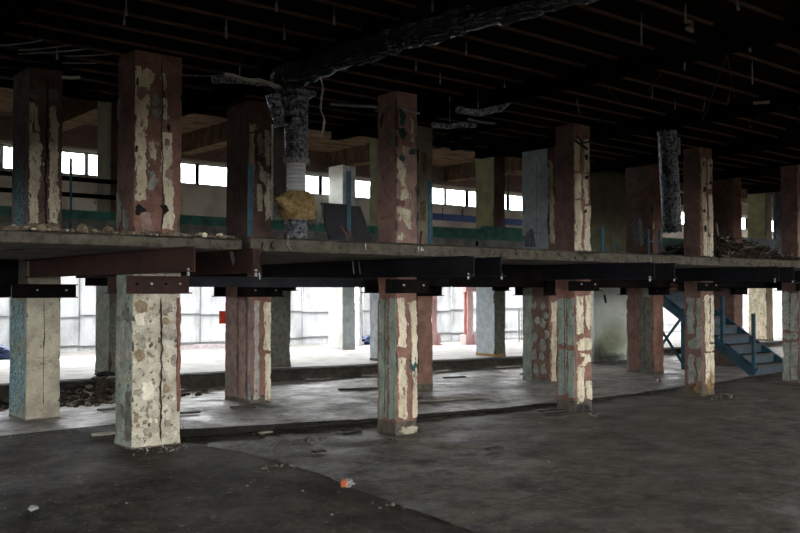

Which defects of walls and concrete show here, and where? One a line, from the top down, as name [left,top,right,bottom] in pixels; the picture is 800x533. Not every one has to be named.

crack [42,77,50,224]
peeling [116,66,175,230]
peeling [522,139,591,261]
peeling [115,298,181,442]
peeling [225,296,271,401]
crack [158,299,386,443]
peeling [378,298,418,434]
crack [417,404,557,418]
peeling [522,288,533,380]
peeling [550,295,592,404]
crack [593,386,685,400]
peeling [686,294,715,385]